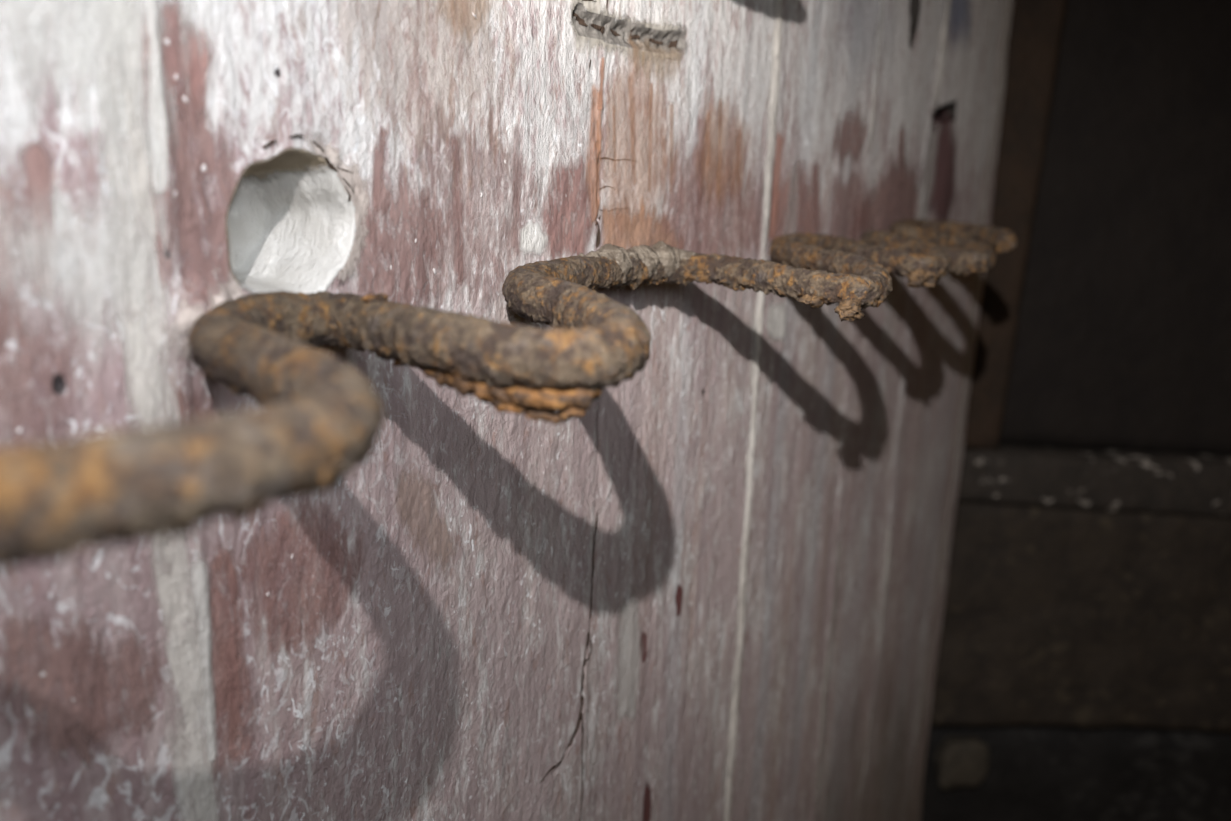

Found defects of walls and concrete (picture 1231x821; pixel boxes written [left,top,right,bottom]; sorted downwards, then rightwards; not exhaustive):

spalling [135,0,463,357]
corrosion [361,293,389,304]
crack [540,513,598,821]
corrosion [675,584,683,616]